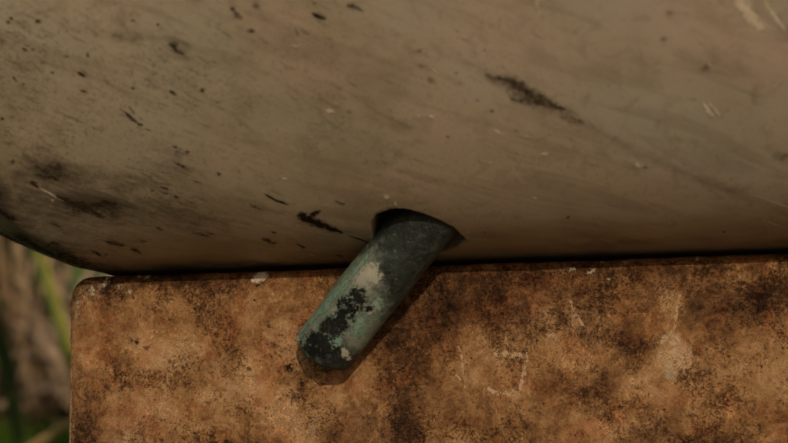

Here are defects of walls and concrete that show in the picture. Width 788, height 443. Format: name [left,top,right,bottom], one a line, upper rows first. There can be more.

leakage [487,75,581,122]
leakage [29,161,121,218]
leakage [0,226,146,269]
leakage [349,261,384,290]
leakage [657,294,692,380]
leakage [484,350,529,398]